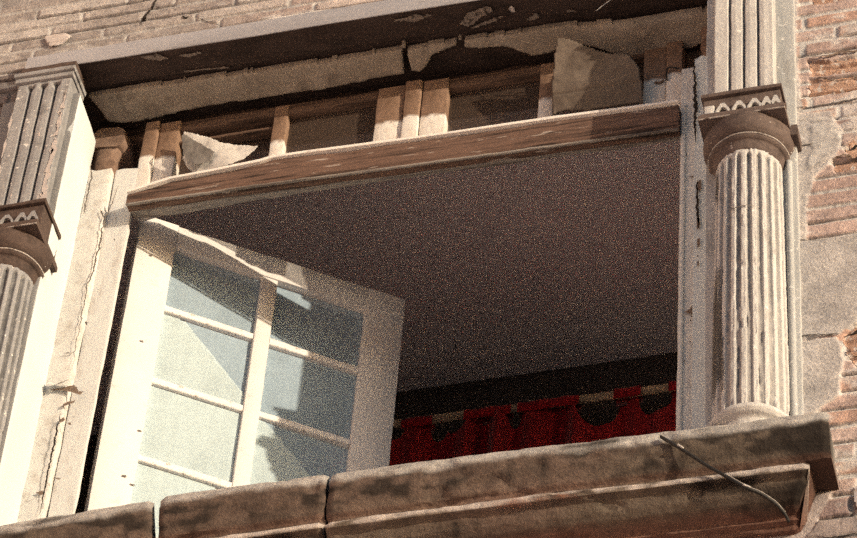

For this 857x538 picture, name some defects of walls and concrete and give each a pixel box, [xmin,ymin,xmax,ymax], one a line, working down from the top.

crack [140,0,157,26]
peeling [460,6,503,28]
flaking render [809,117,857,173]
crack [67,165,117,369]
spalling [843,327,857,366]
crack [40,411,61,512]